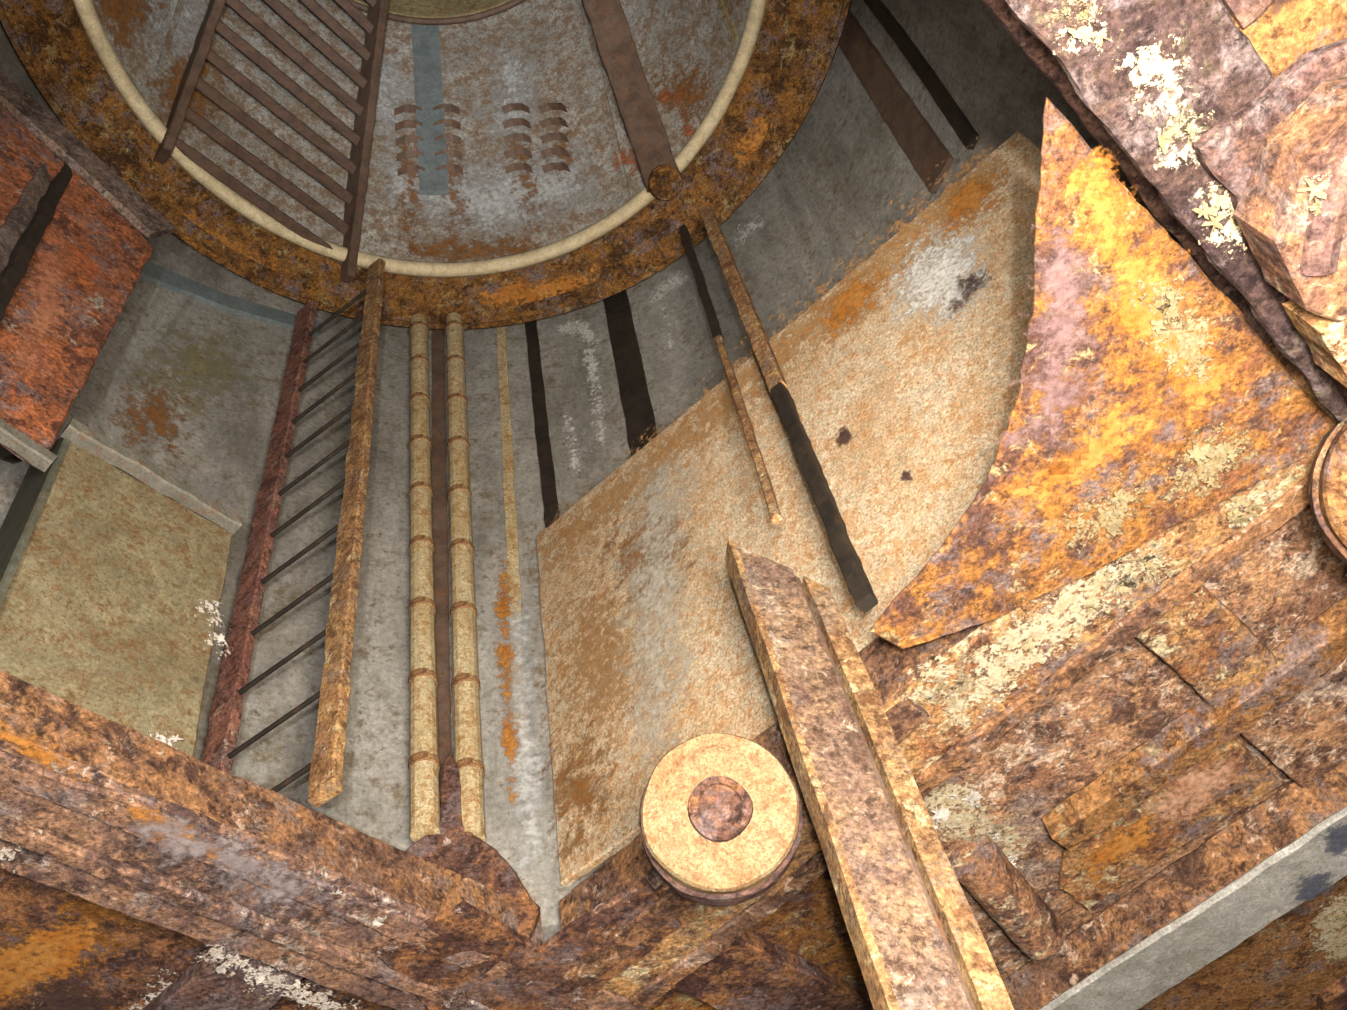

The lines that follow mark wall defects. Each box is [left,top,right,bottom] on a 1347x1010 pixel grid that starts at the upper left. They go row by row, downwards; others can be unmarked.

corrosion [93,0,170,56]
corrosion [651,57,712,144]
corrosion [729,113,776,168]
corrosion [396,134,575,262]
corrosion [10,236,109,379]
corrosion [475,263,602,307]
corrosion [767,145,1013,381]
corrosion [997,148,1246,532]
corrosion [490,336,768,859]
corrosion [0,721,85,781]
corrosion [124,807,309,905]
corrosion [0,892,146,1003]